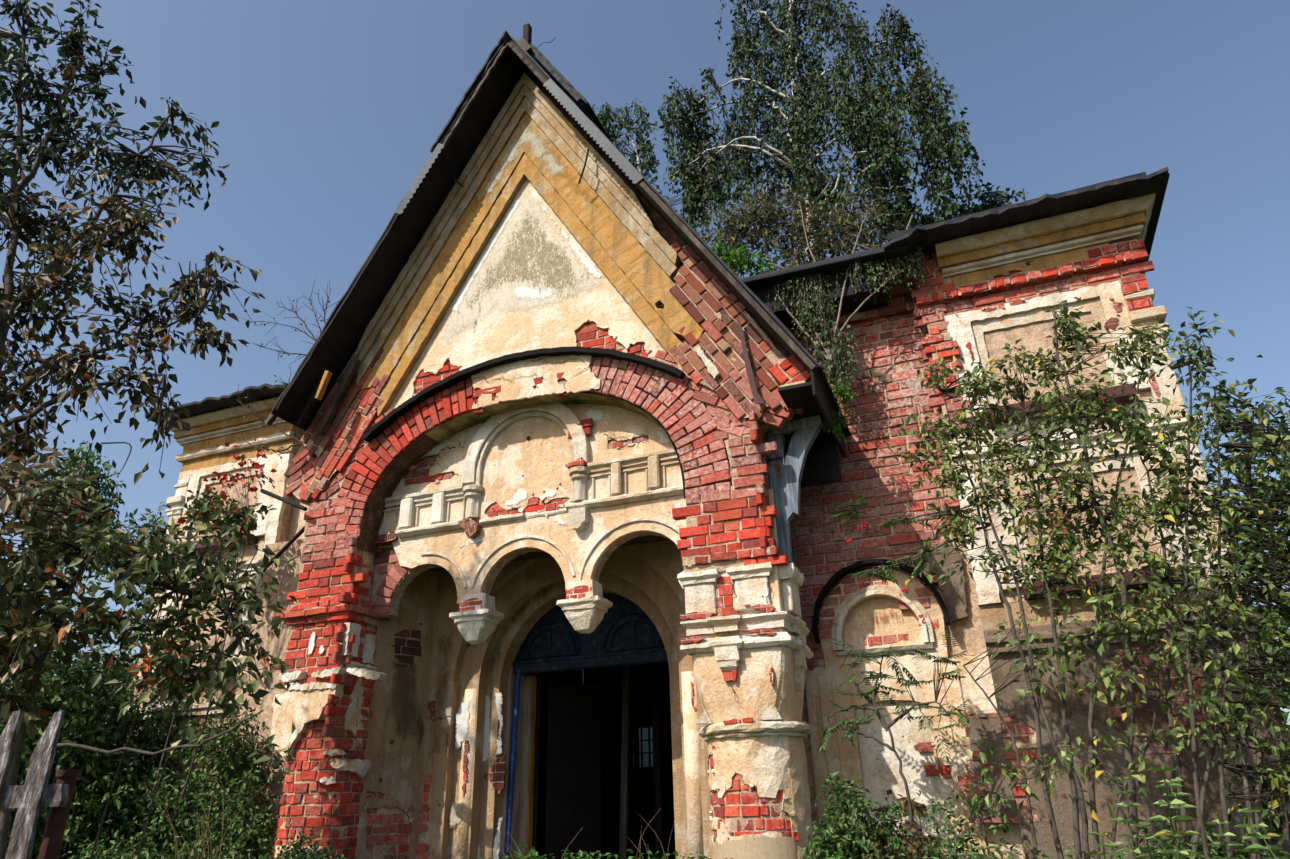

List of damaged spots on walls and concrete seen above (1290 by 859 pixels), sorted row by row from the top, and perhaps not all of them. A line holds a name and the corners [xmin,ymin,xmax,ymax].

damp [442,192,601,342]
flaking render [576,319,652,356]
flaking render [411,356,463,396]
flaking render [565,457,587,469]
flaking render [458,483,570,539]
flaking render [462,740,506,798]
flaking render [706,746,799,842]
flaking render [914,712,1039,824]